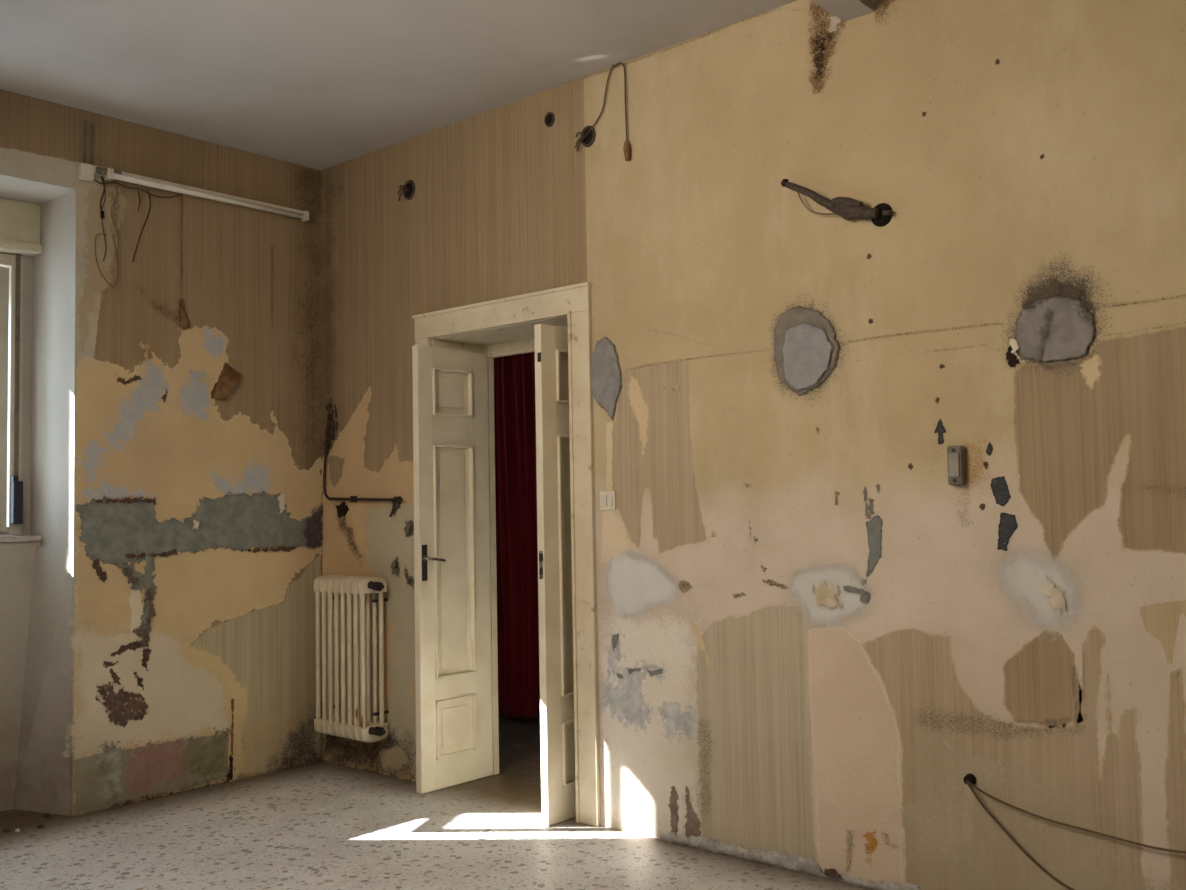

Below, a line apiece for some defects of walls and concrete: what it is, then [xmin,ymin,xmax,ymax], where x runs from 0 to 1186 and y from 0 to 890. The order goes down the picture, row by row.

water stain [807,1,845,95]
peeling [935,419,946,444]
peeling [60,184,416,814]
spalling [843,484,883,603]
peeling [990,476,1018,551]
peeling [597,600,920,890]